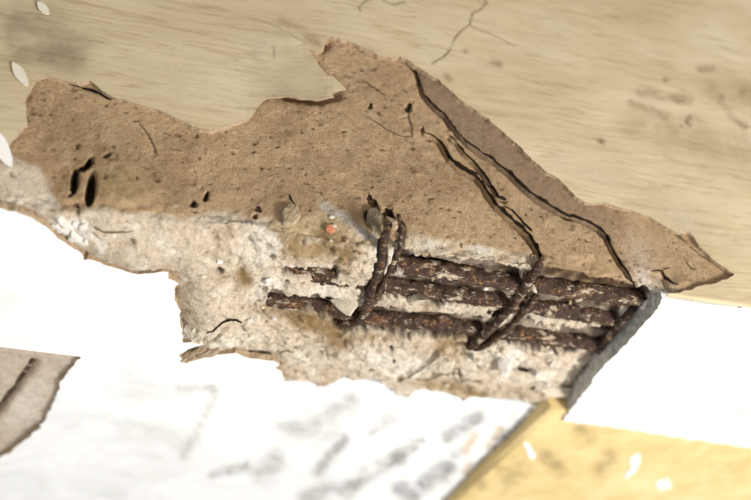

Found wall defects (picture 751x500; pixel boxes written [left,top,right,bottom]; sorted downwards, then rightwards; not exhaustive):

crack [370,0,647,300]
spalling [0,20,732,404]
crack [206,319,242,334]
crack [651,268,679,285]
spalling [0,347,77,453]